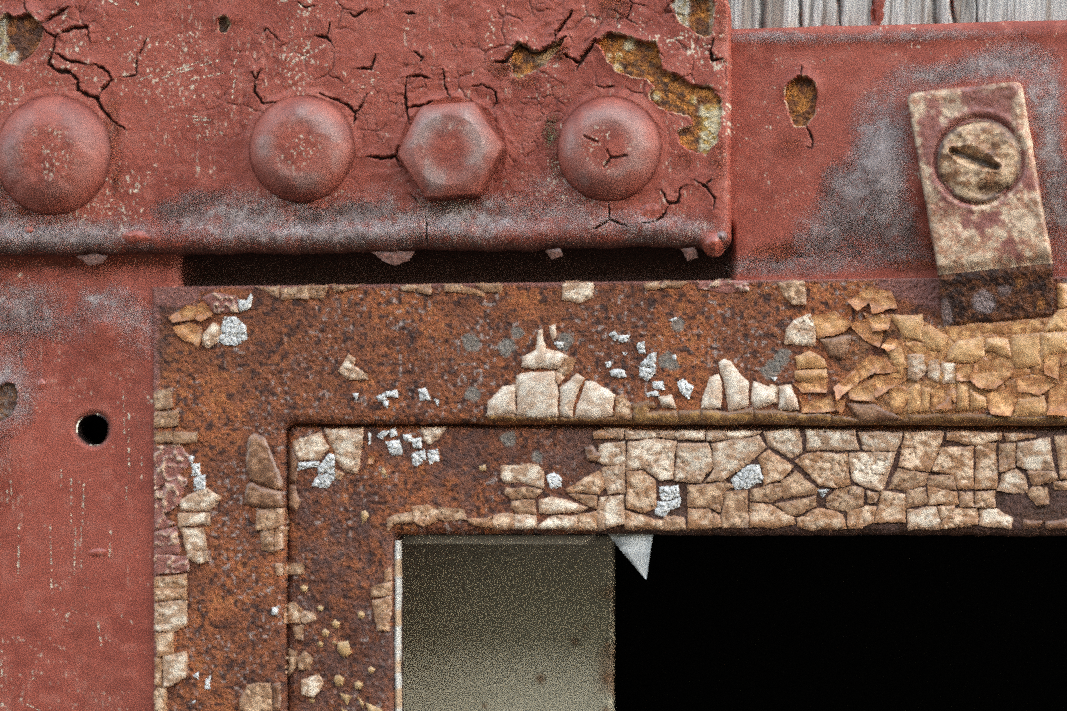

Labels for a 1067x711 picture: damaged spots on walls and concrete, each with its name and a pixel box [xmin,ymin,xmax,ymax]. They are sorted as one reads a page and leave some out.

spalling [0,15,44,65]
crack [24,0,146,125]
crack [317,12,363,43]
crack [330,98,363,123]
crack [404,52,498,123]
crack [501,13,596,68]
spalling [596,33,722,154]
crack [656,181,716,222]
peeling [169,283,365,348]
peeling [386,279,1067,531]
peeling [153,388,222,711]
peeling [239,426,447,711]